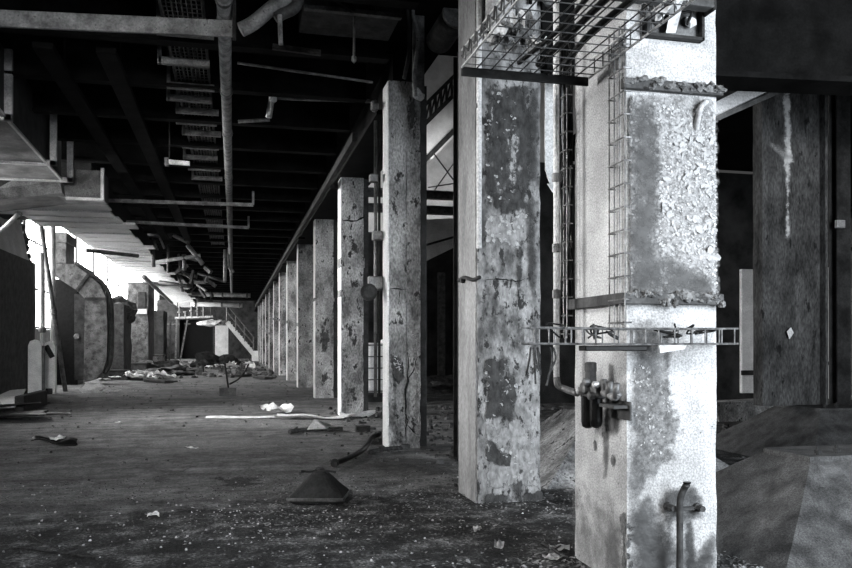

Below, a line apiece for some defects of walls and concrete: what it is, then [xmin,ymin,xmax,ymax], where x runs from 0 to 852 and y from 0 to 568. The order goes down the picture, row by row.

leakage [516,204,536,298]
peeling [629,94,721,293]
leakage [772,93,793,236]
crack [404,352,419,437]
peeling [484,358,539,488]
leakage [635,330,669,425]
leakage [630,452,716,568]